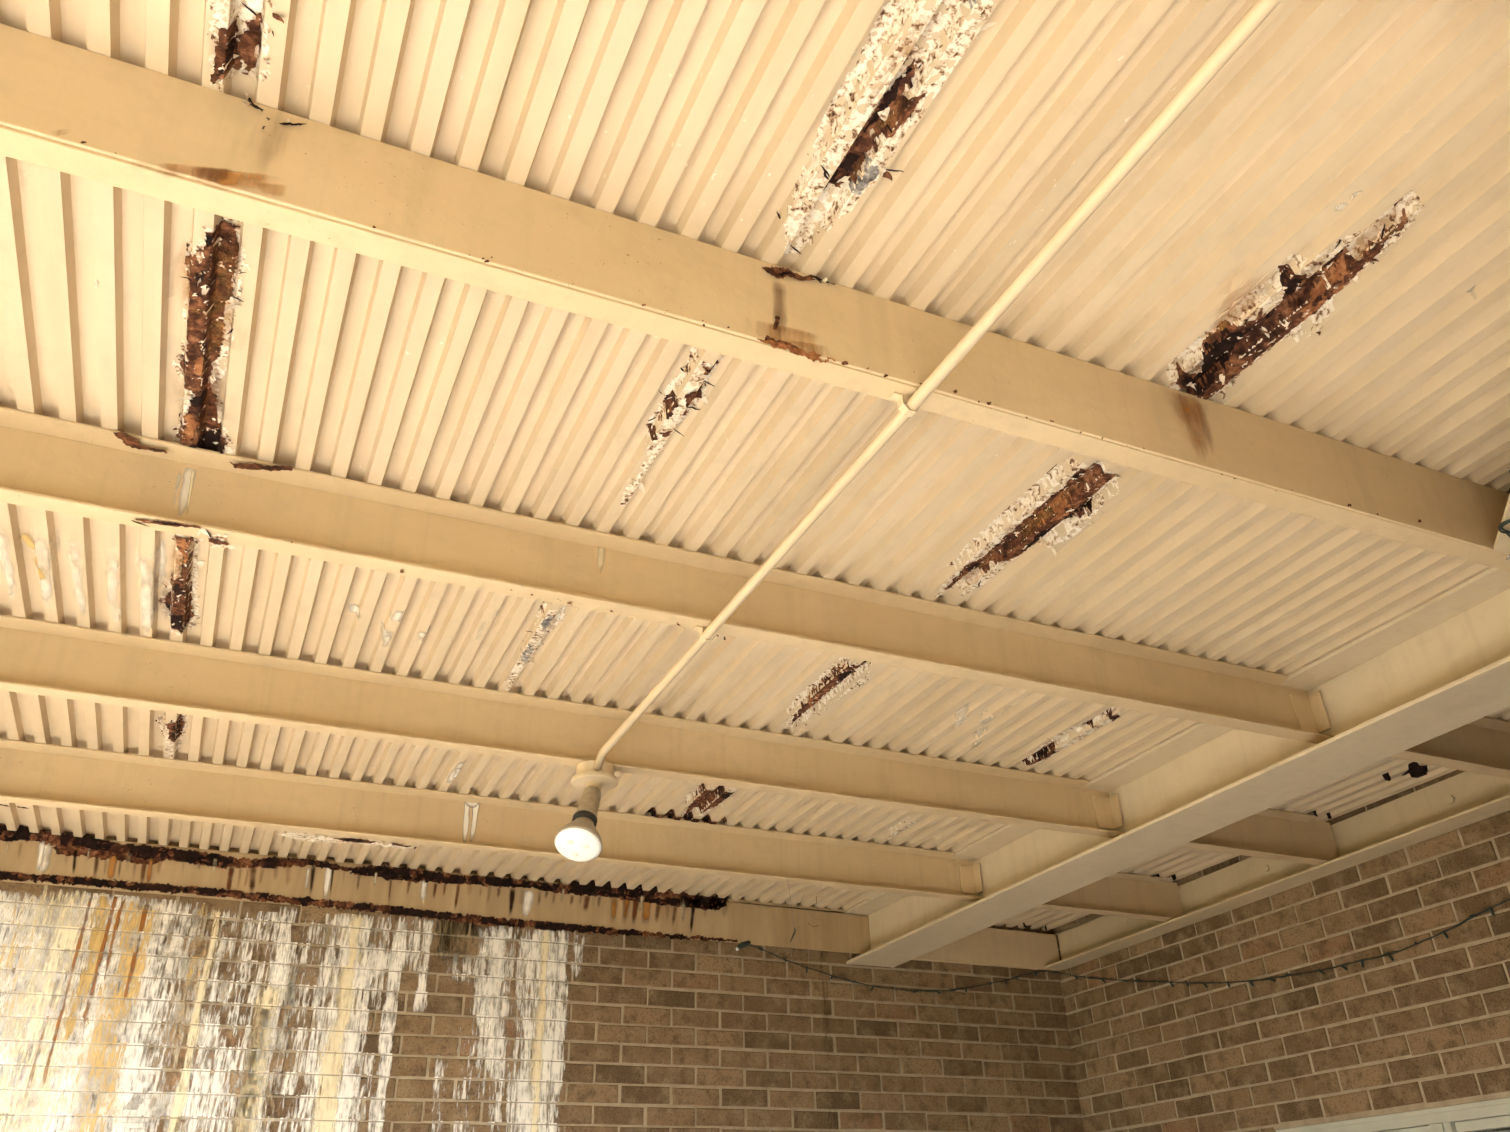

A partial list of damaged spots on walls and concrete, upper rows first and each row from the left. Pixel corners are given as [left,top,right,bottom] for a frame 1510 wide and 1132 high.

rust [204,0,284,92]
rust [113,217,293,471]
rust [1166,190,1425,446]
rust [131,519,236,637]
rust [935,457,1121,597]
rust [784,657,872,735]
damp [37,843,51,870]
damp [306,867,334,895]
rust [0,804,738,943]
damp [0,888,585,1132]